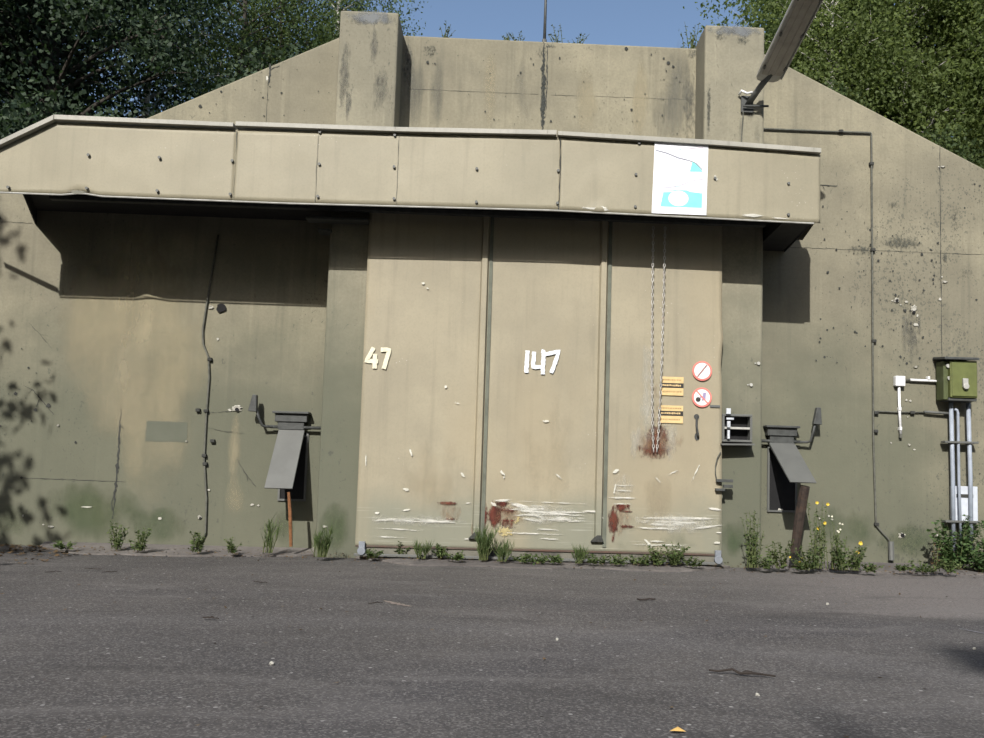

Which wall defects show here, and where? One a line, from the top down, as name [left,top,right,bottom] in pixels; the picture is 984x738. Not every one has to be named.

rust [639,426,670,457]
rust [485,502,514,528]
peeling [491,499,603,540]
rust [608,504,633,541]
peeling [640,508,721,550]